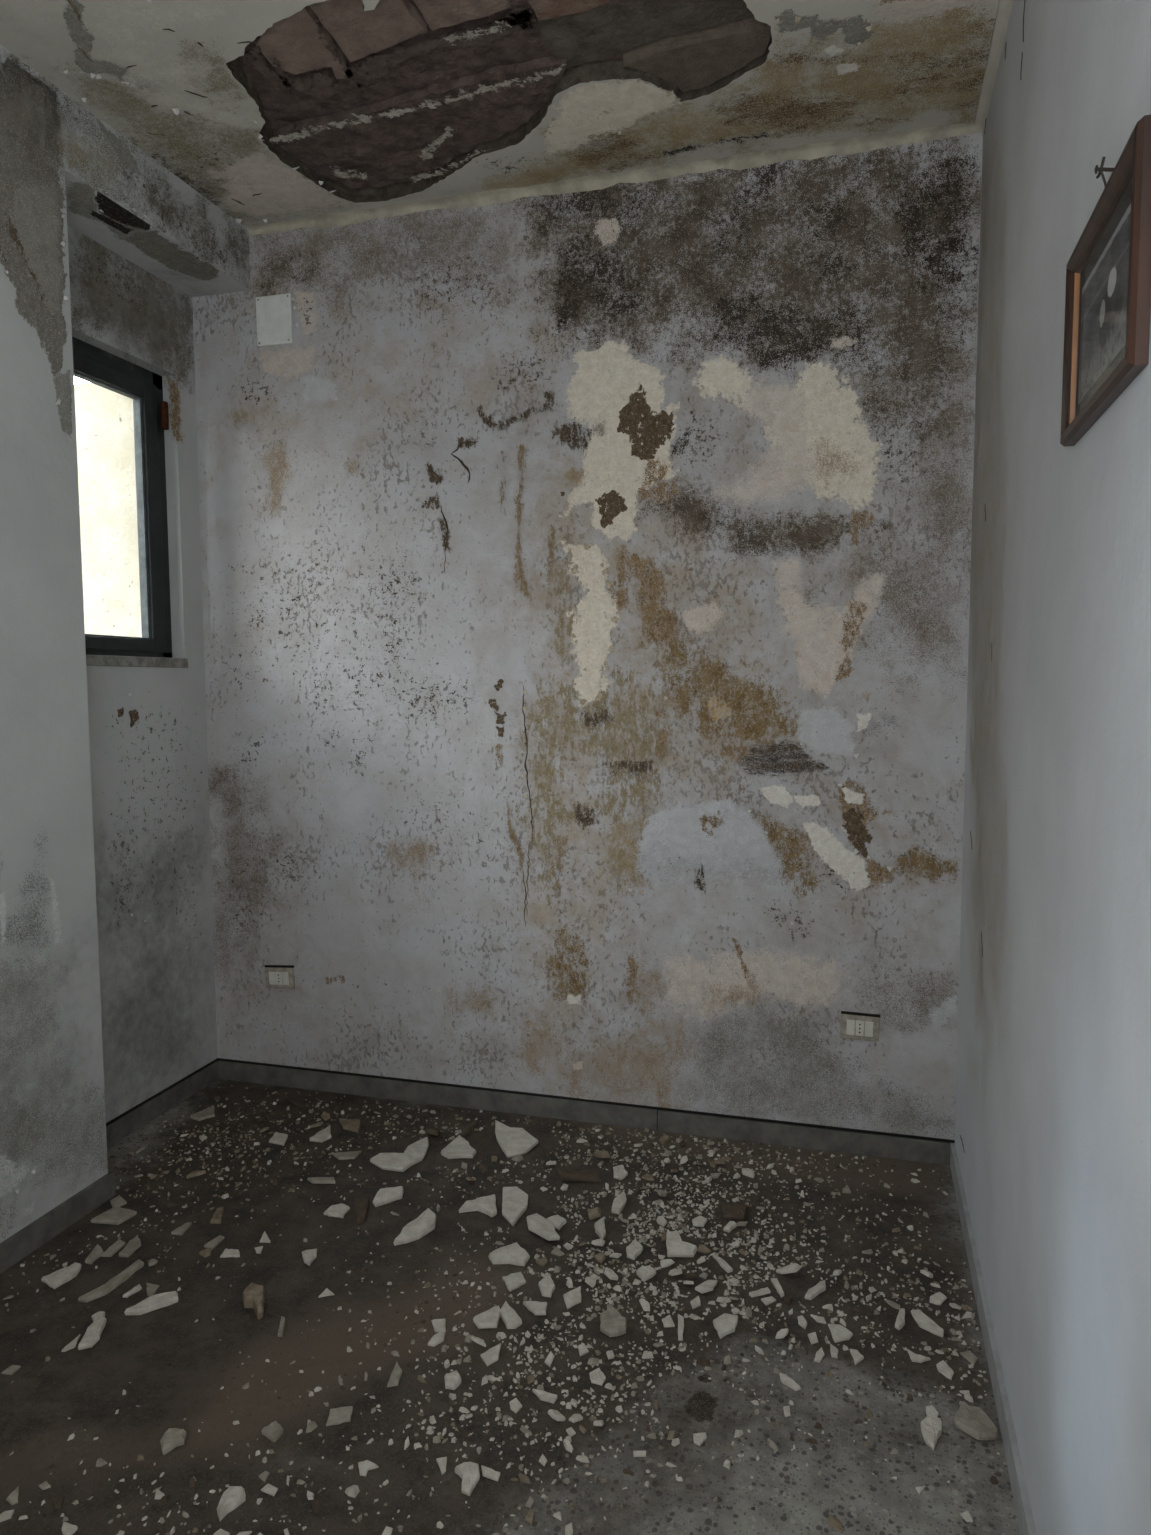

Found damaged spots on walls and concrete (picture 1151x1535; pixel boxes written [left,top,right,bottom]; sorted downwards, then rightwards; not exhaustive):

flaking render [0,55,219,441]
spalling [226,0,988,203]
damp [0,0,1008,1140]
peeling [535,339,683,707]
peeling [690,335,884,549]
damp [0,831,108,1241]